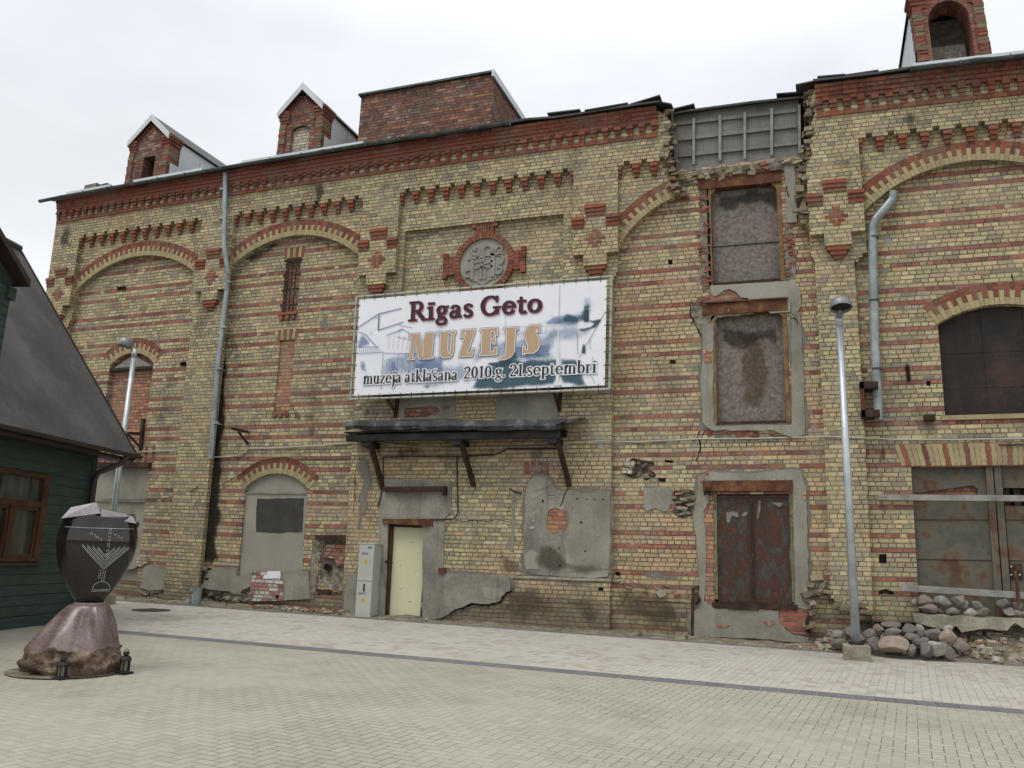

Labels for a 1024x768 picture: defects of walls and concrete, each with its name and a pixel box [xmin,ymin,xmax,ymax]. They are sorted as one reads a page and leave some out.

spalling [661,89,815,442]
spalling [128,551,166,599]
water stain [201,337,227,599]
spalling [200,566,254,603]
spalling [275,535,346,600]
spalling [424,458,874,643]